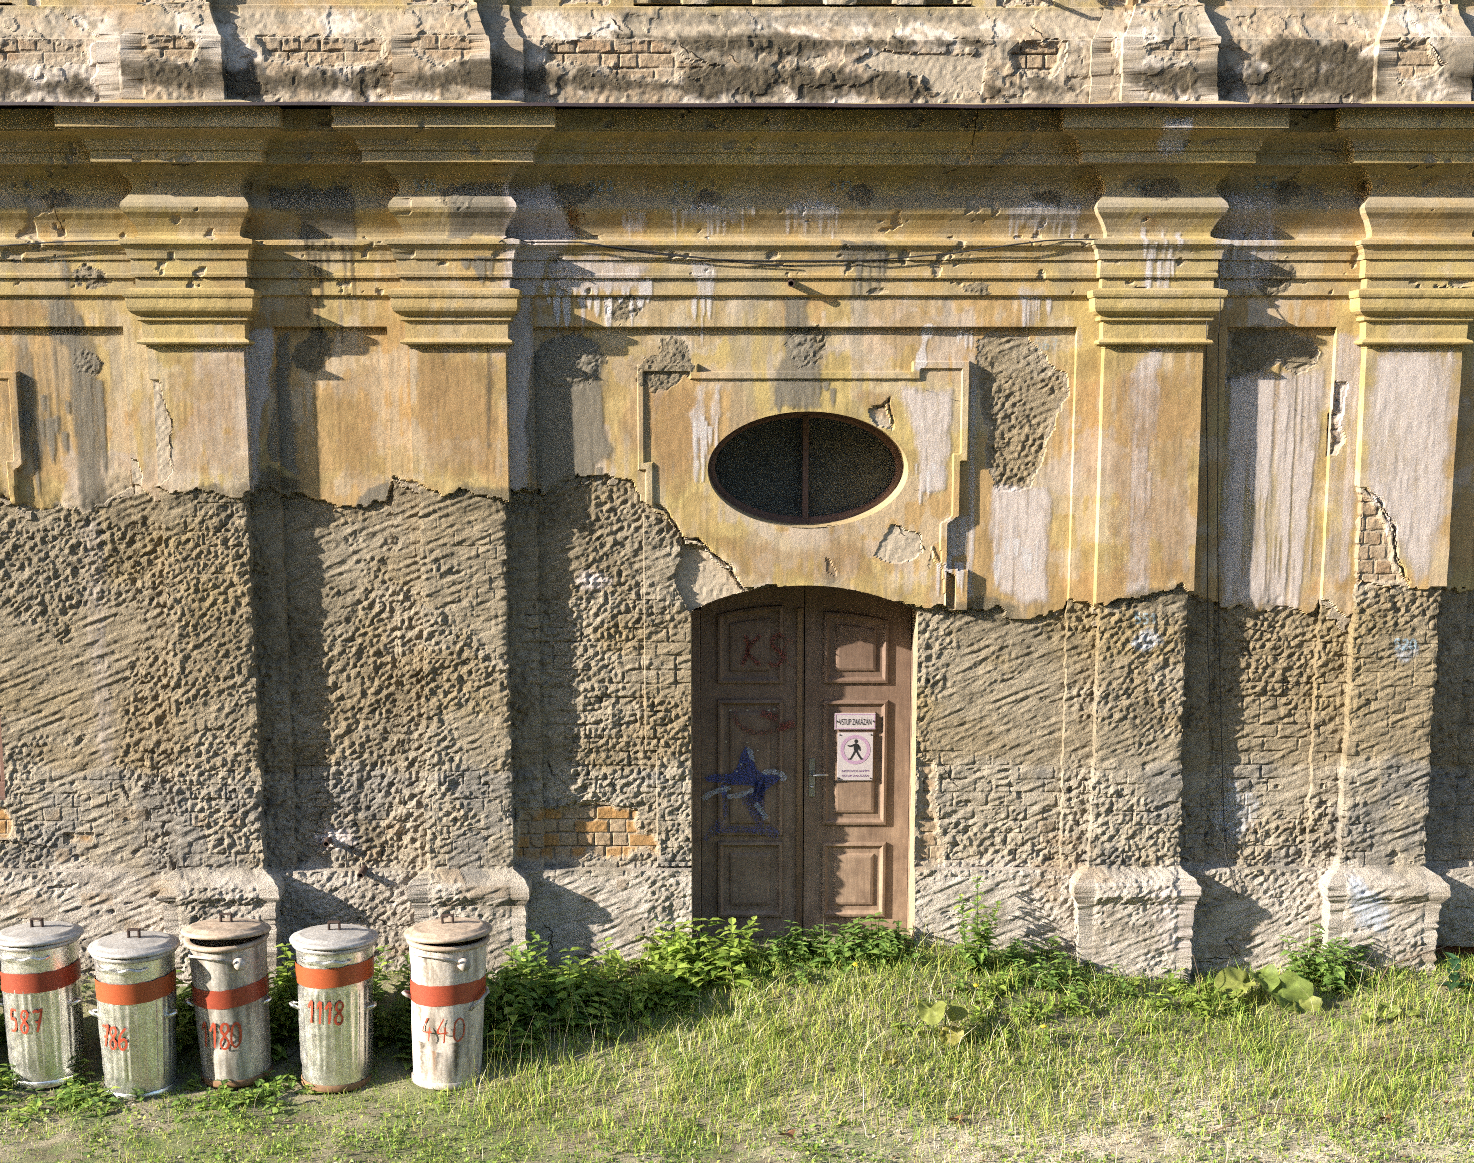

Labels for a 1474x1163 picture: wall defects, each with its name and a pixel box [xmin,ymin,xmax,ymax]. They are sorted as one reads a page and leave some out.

flaking render [140,34,198,64]
flaking render [142,0,209,13]
flaking render [411,29,471,66]
flaking render [1144,36,1221,63]
spalling [1394,0,1452,15]
leakage [13,240,106,509]
spalling [976,330,1069,490]
spalling [1225,325,1319,383]
crack [657,507,744,591]
crack [1365,489,1409,582]
spalling [0,381,776,987]
spalling [897,487,1474,984]